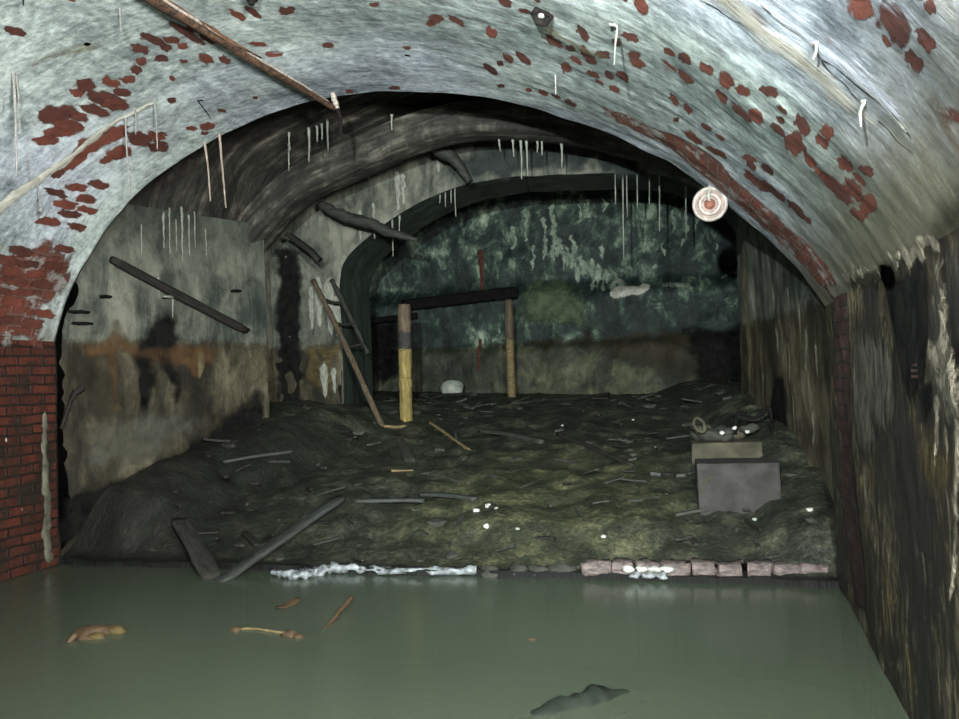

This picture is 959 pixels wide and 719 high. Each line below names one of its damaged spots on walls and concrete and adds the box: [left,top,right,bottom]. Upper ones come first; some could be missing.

peeling [31,21,230,232]
peeling [545,24,645,93]
peeling [661,47,877,222]
crack [700,0,913,154]
peeling [847,0,936,73]
peeling [0,239,75,351]
water stain [135,298,180,418]
water stain [276,248,340,402]
water stain [371,321,412,385]
water stain [510,203,650,299]
peeling [601,93,940,456]
water stain [928,263,959,601]